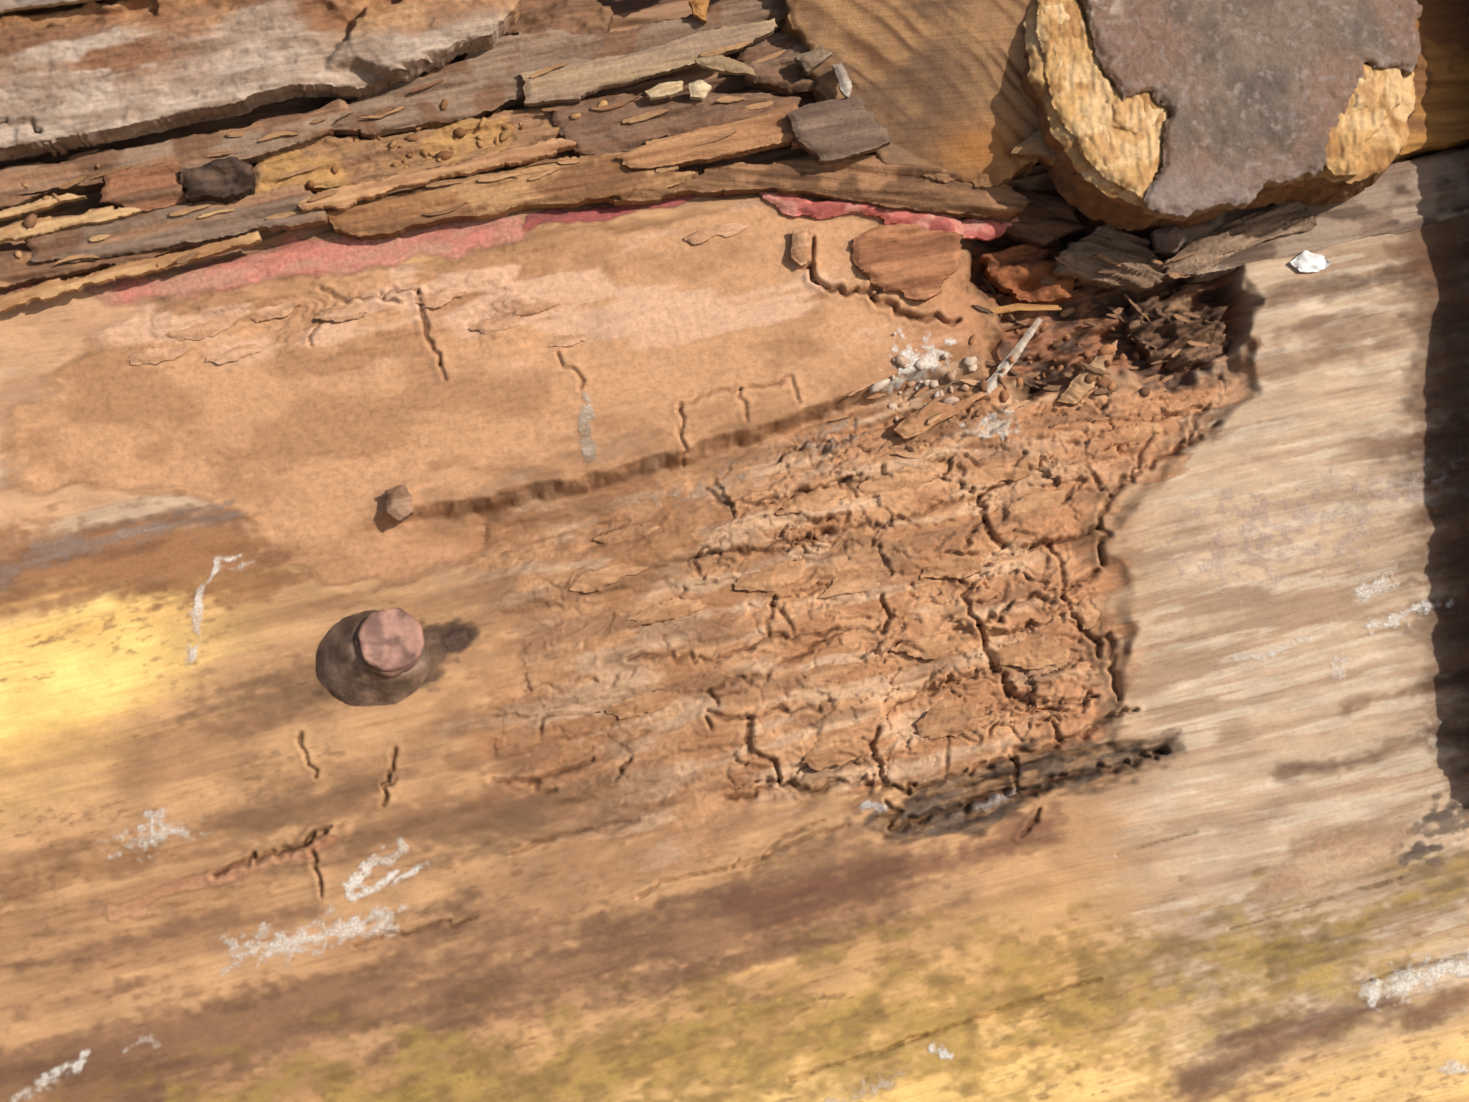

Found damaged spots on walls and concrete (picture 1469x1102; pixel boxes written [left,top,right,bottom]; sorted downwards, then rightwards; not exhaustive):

spalling [1035,0,1170,200]
spalling [1323,63,1403,179]
peeling [87,195,695,304]
peeling [759,191,1019,241]
crack [693,476,889,573]
crack [978,415,1199,586]
water stain [1356,216,1469,782]
rust [421,621,479,686]
crack [790,597,888,661]
crack [876,580,1011,735]
water stain [1393,795,1469,903]
water stain [0,796,1200,1102]